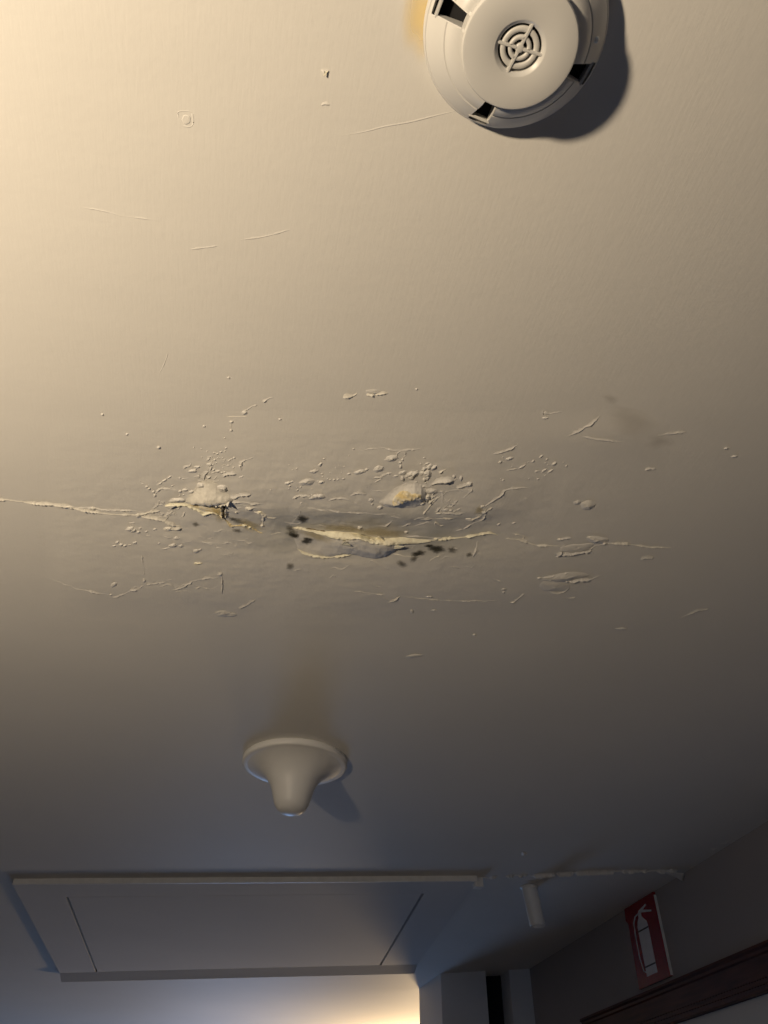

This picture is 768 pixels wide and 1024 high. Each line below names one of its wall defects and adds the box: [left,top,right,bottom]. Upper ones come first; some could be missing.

crack [0,498,193,547]
peeling [165,456,479,578]
damp [400,545,453,565]
crack [431,487,671,557]